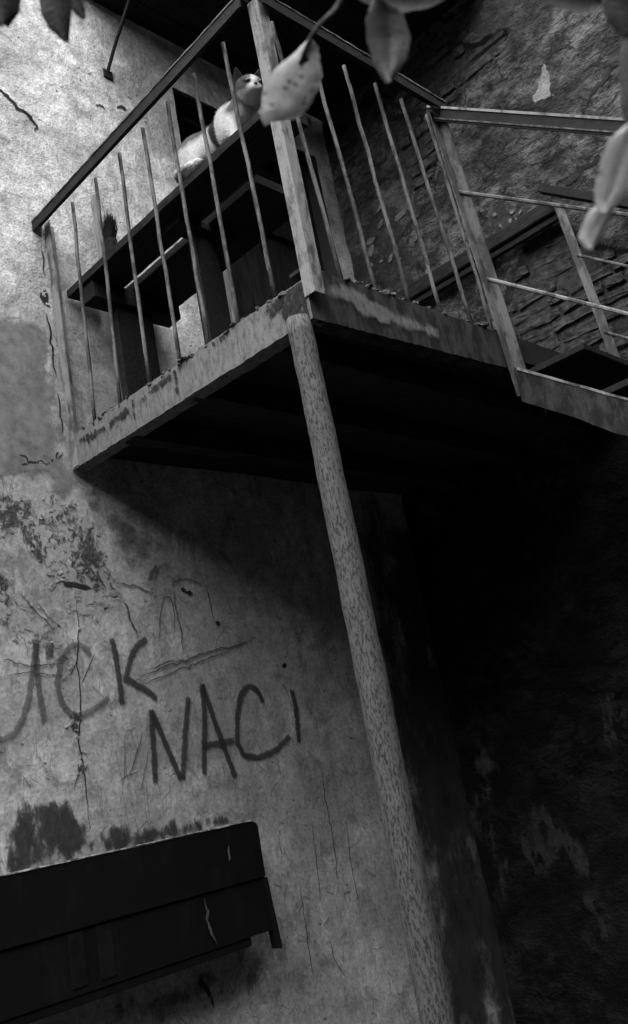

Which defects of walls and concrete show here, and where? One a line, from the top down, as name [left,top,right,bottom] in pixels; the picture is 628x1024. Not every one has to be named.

crack [0,89,38,132]
flaking render [532,64,554,102]
crack [20,313,63,466]
peeling [0,488,119,631]
crack [70,604,95,834]
leakage [6,801,228,873]